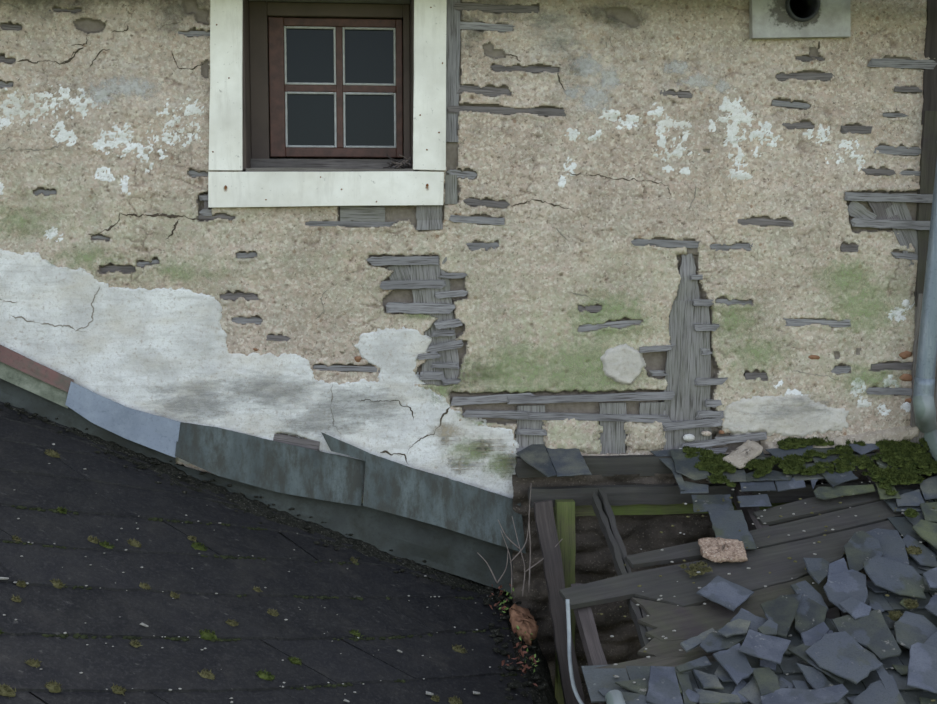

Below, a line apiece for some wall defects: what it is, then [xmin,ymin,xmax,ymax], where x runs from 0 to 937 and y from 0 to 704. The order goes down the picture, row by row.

crack [17,25,129,66]
spalling [305,0,566,232]
peeling [564,89,710,175]
peeling [708,88,921,180]
peeling [558,157,577,188]
crack [88,213,200,239]
spalling [196,192,235,222]
spalling [737,216,794,227]
spalling [840,189,933,271]
crack [0,287,100,332]
peeling [0,237,915,499]
crack [358,399,451,465]